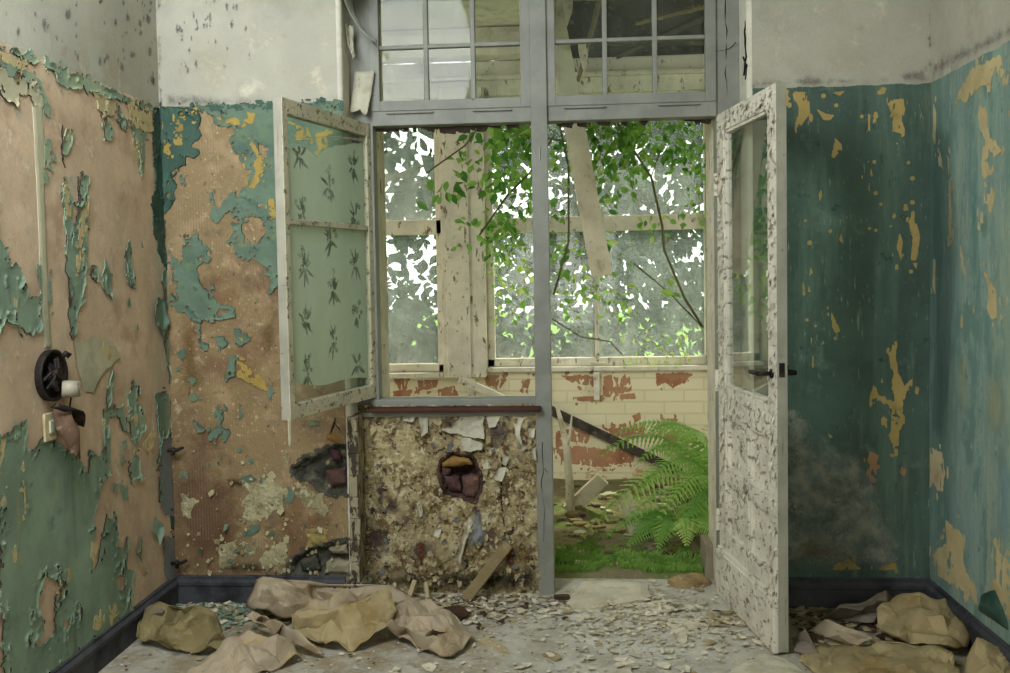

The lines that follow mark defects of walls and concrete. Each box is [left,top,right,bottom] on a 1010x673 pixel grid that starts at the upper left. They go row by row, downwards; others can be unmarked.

peeling [301,0,377,116]
peeling [955,55,1009,234]
peeling [0,46,278,402]
peeling [0,371,157,673]
spalling [285,537,354,577]
spalling [289,420,352,499]
spalling [436,416,509,565]
spalling [561,371,636,405]
spalling [553,413,703,471]
water stain [788,410,896,565]
peeling [864,341,919,483]
peeling [930,520,1010,630]